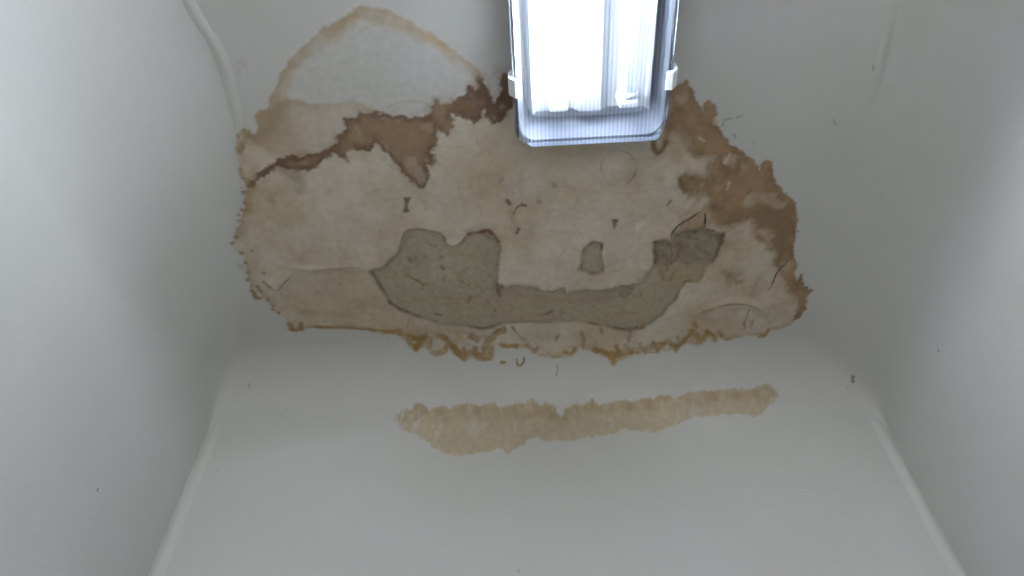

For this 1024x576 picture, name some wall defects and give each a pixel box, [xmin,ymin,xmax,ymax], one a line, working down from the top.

water stain [229,2,815,377]
peeling [367,210,727,333]
crack [766,257,792,294]
water stain [391,382,781,458]